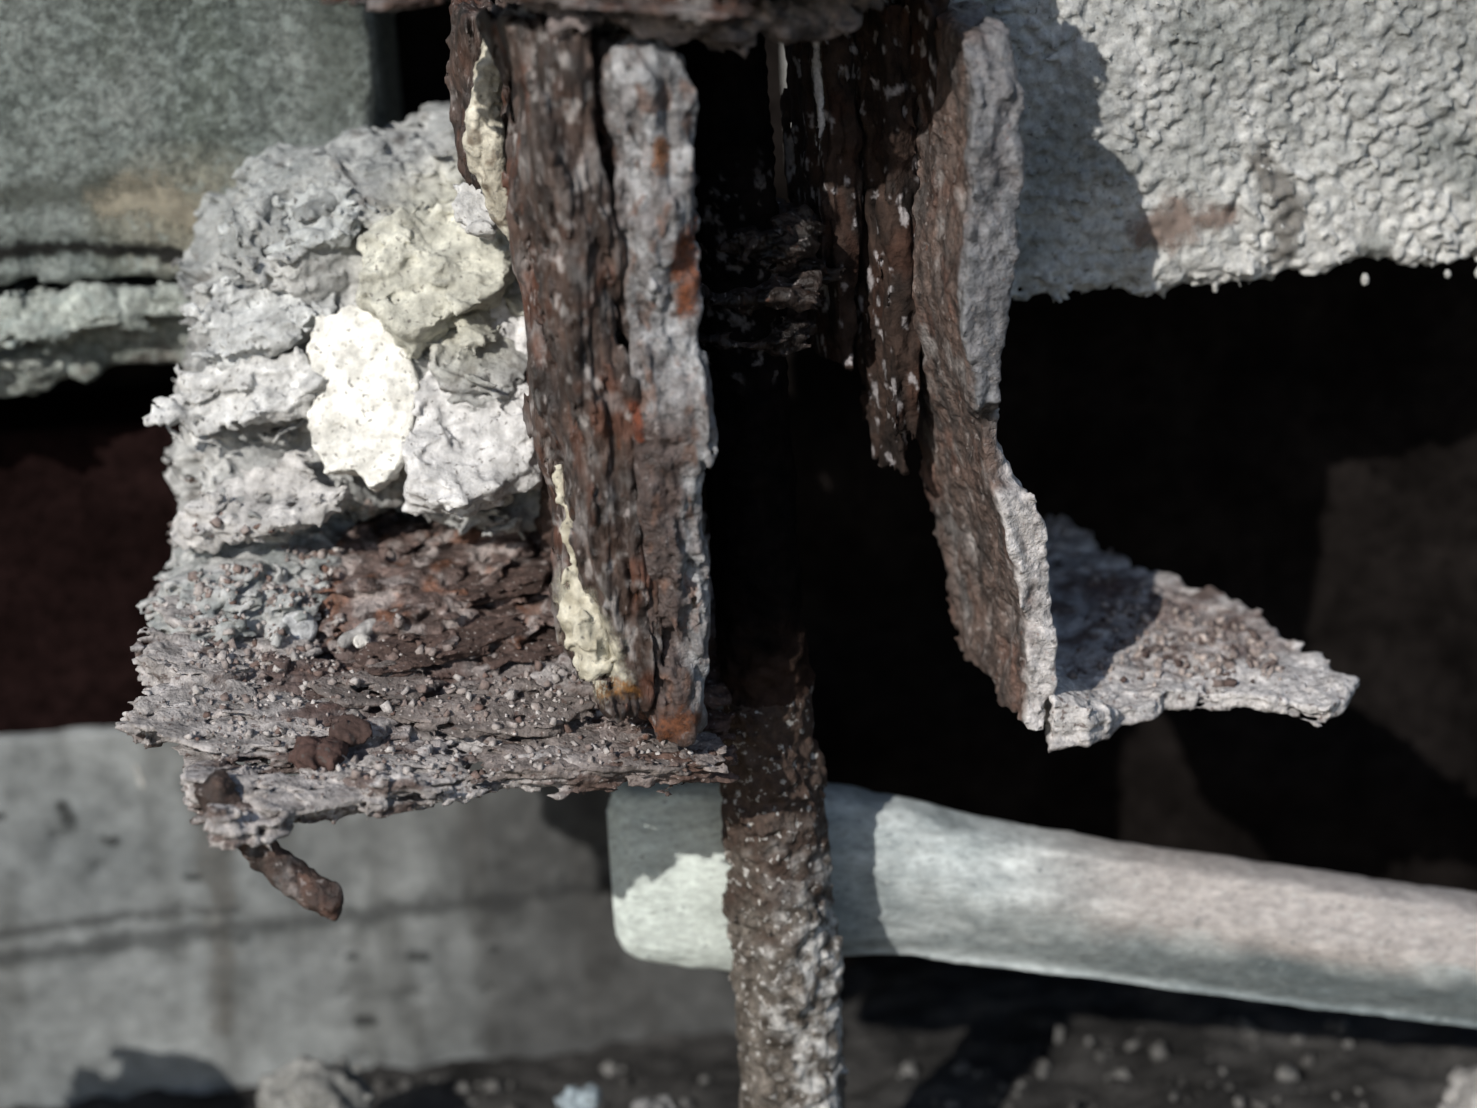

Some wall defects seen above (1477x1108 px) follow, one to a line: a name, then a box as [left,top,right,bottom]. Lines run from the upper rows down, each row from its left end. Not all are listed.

spalling [0,102,542,555]
peeling [237,840,344,921]
peeling [115,592,729,821]
corrosion [444,0,700,741]
leakage [552,464,625,696]
corrosion [780,0,950,476]